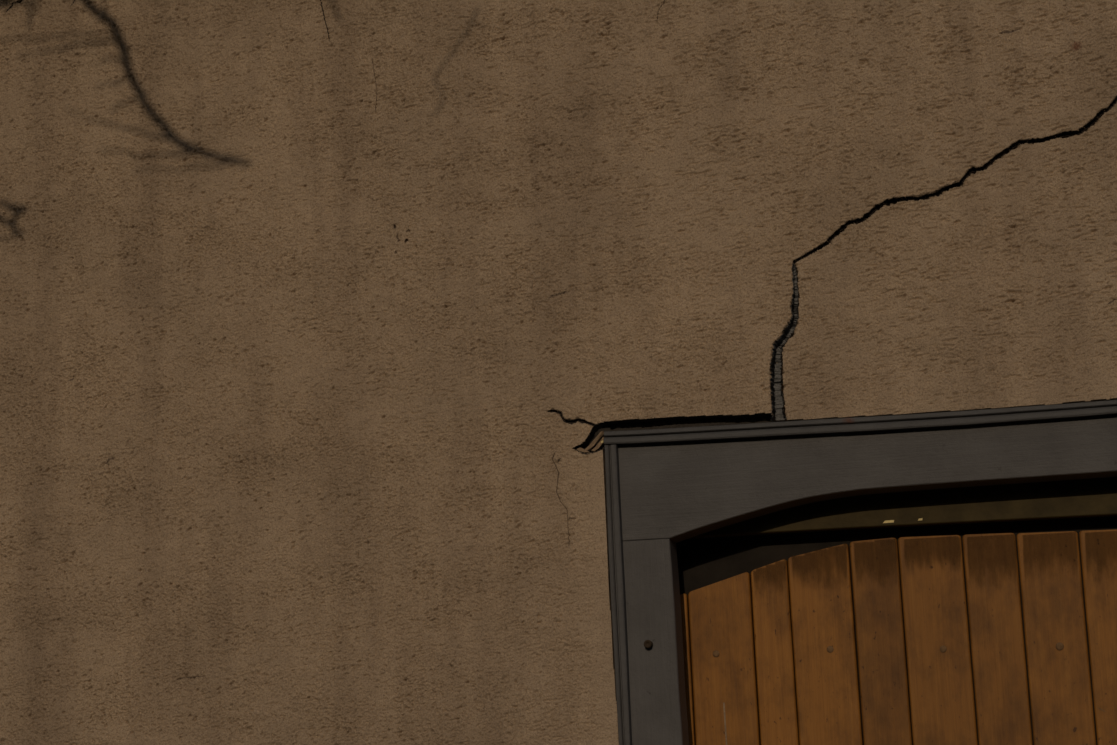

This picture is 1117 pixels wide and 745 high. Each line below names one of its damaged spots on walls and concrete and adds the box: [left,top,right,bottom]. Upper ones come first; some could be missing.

crack [769,96,1117,422]
crack [548,410,597,426]
crack [552,453,575,546]